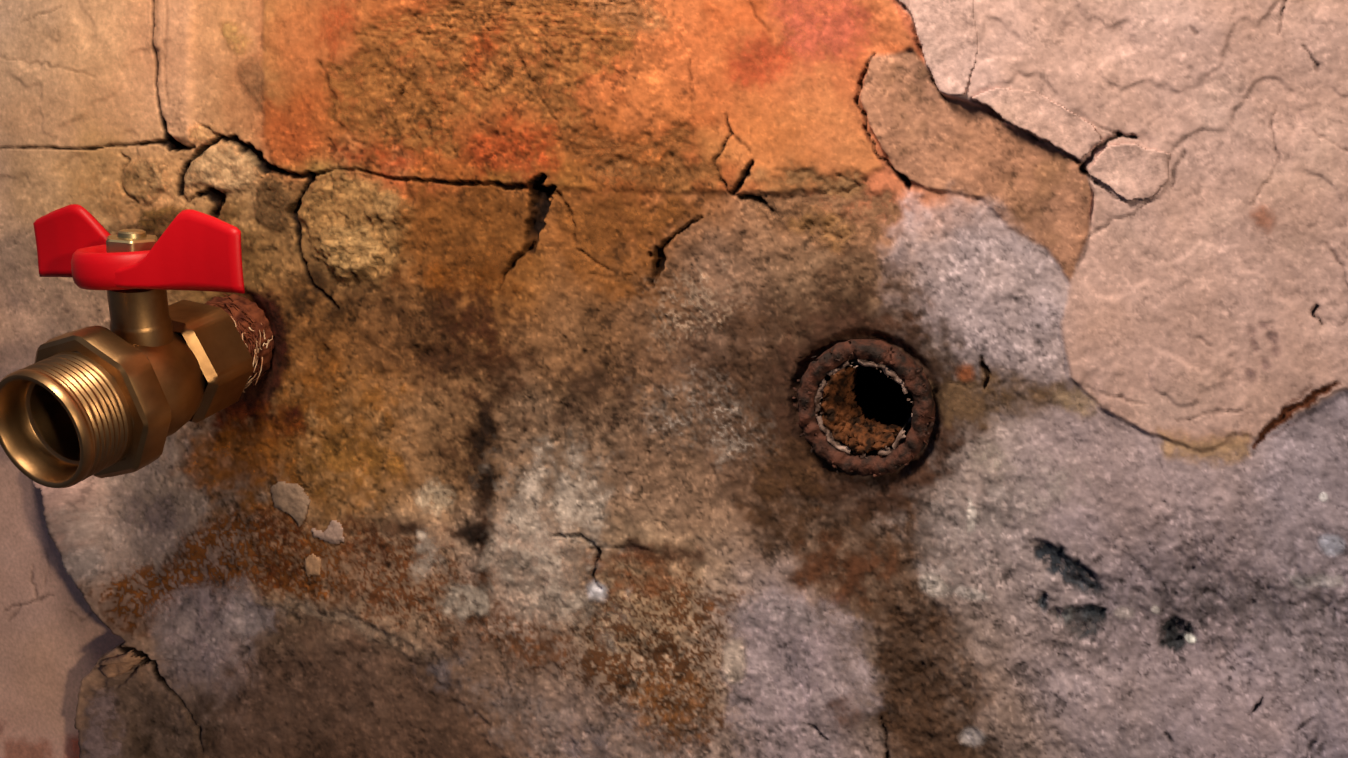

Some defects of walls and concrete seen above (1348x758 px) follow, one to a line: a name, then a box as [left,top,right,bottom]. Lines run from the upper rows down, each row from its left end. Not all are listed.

crack [20,0,576,308]
spalling [185,125,411,282]
crack [649,216,703,288]
crack [715,118,774,212]
flaking render [909,0,1170,201]
corrosion [185,290,305,483]
corrosion [819,363,905,455]
corrosion [91,509,744,755]
water stain [665,252,1072,758]
spalling [1035,541,1106,639]
water stain [1115,608,1131,617]
water stain [1319,535,1345,555]